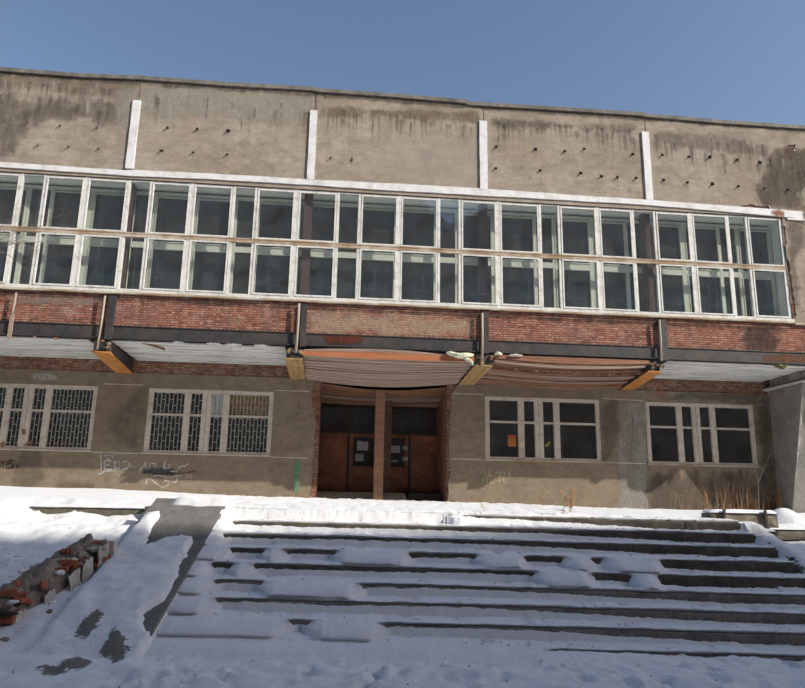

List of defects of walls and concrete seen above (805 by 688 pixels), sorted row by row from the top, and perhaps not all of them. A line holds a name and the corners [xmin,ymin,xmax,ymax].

damp [0,86,314,153]
damp [757,145,805,208]